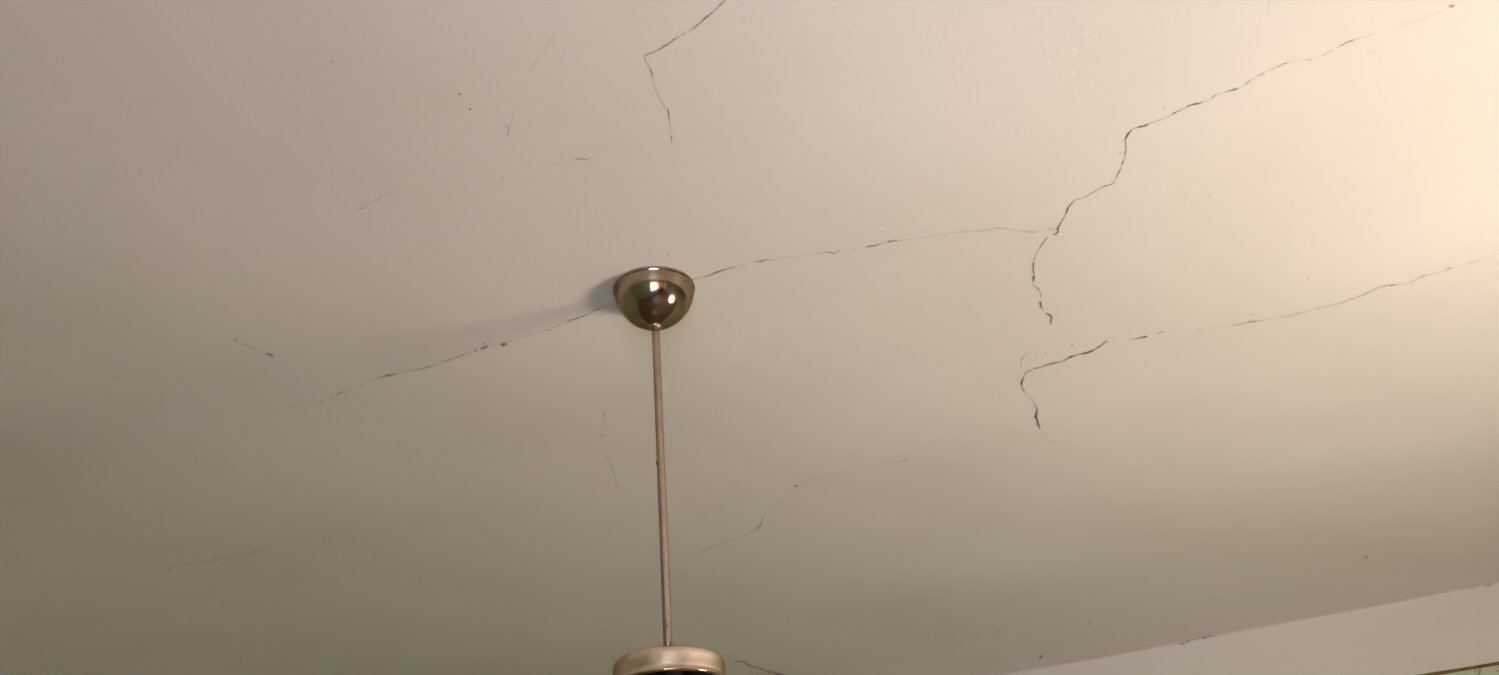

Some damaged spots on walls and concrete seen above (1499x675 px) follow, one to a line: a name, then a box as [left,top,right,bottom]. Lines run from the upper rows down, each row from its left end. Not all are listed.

crack [1033,63,1285,324]
crack [1020,343,1104,425]